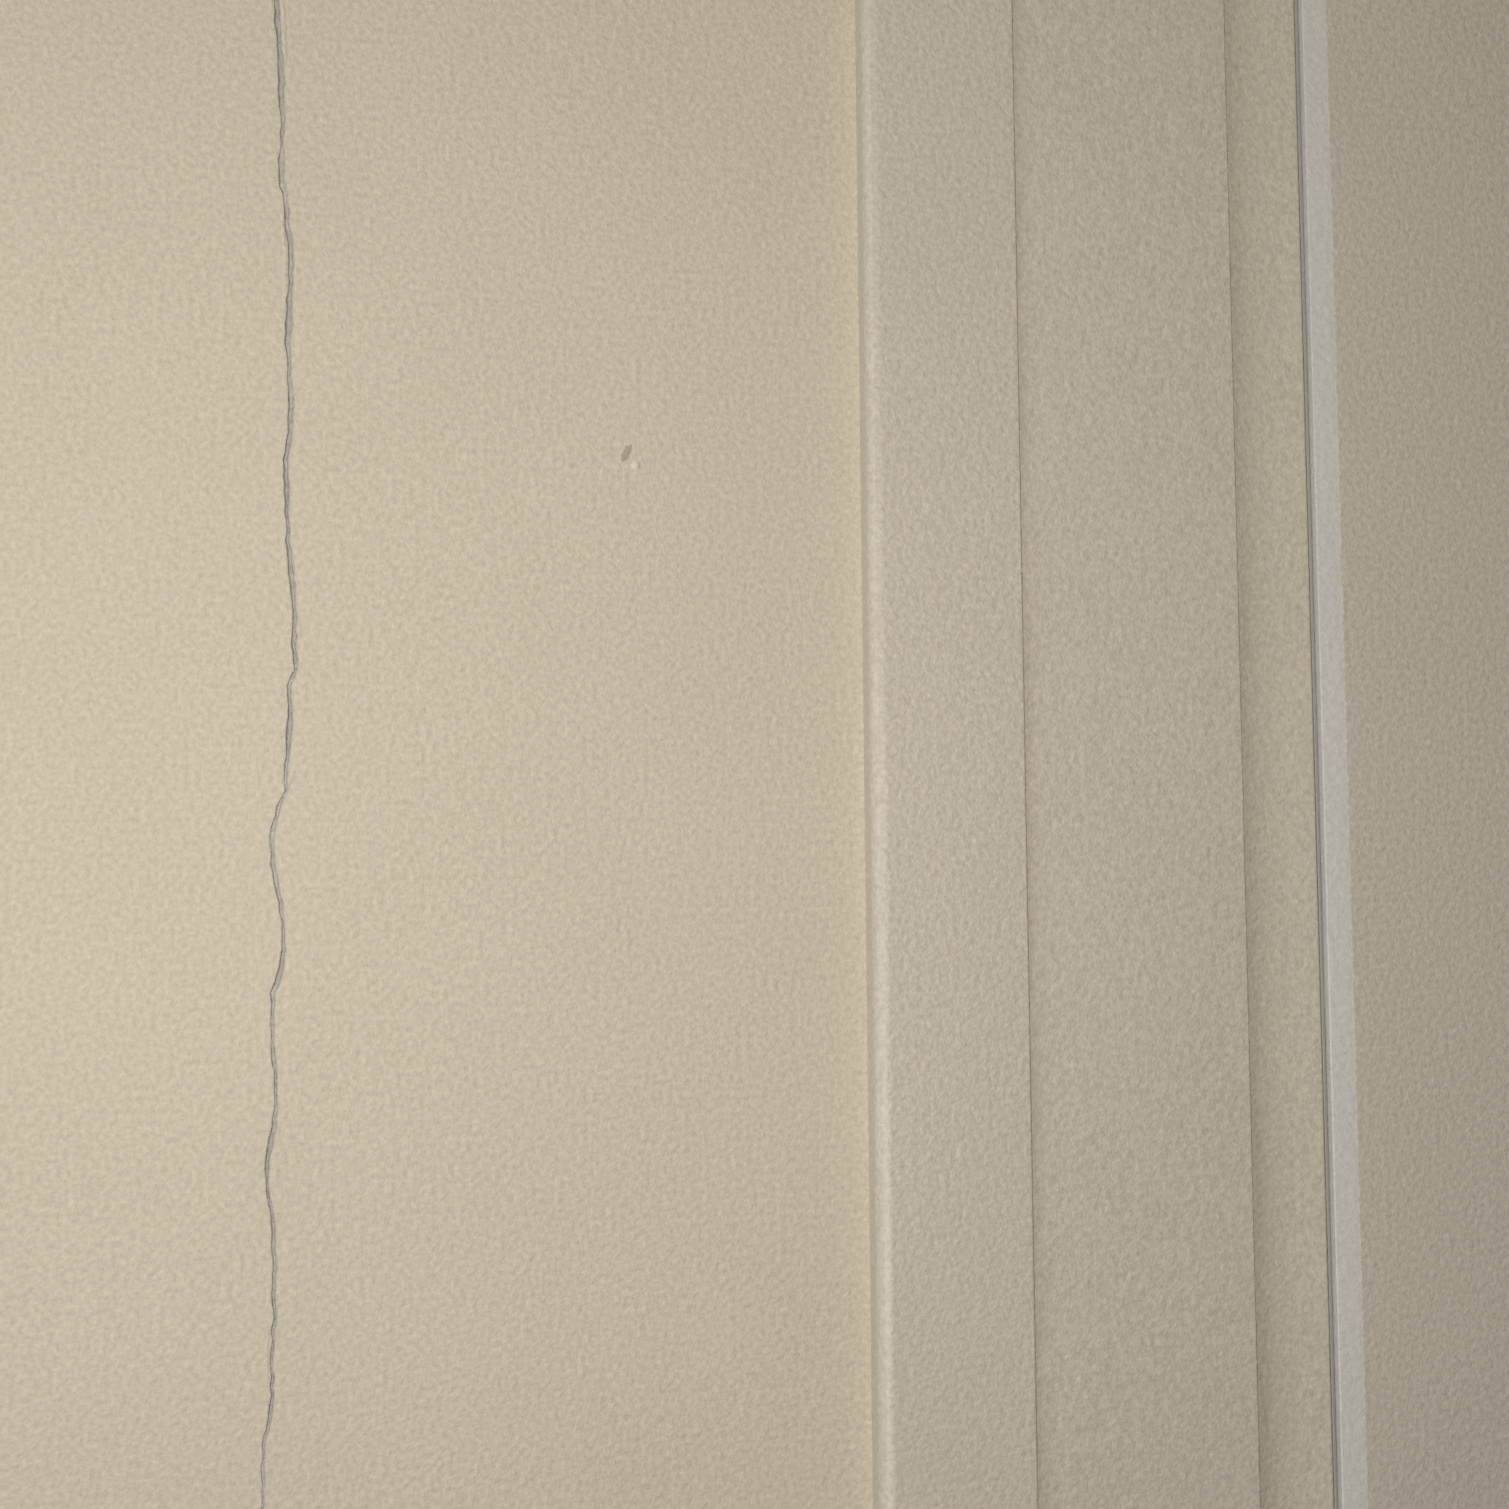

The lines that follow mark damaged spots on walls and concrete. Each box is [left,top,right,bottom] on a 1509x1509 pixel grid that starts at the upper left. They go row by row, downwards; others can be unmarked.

crack [260,0,299,1509]